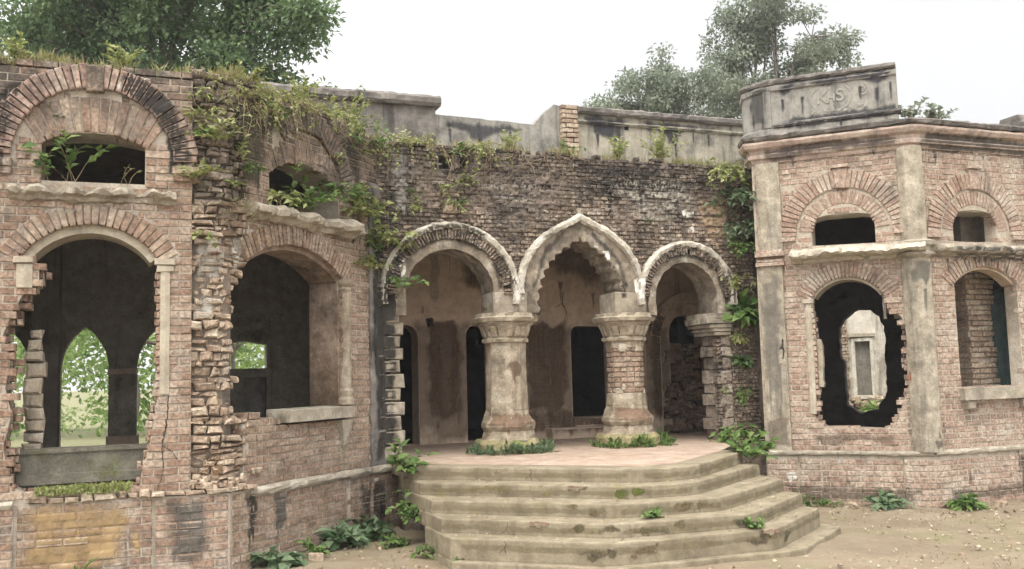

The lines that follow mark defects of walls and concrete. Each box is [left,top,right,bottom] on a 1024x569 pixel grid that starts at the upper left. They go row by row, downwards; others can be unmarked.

damp [447,122,518,143]
damp [352,191,485,461]
flaking render [190,230,249,487]
crack [157,396,179,490]
damp [168,502,205,562]
damp [246,495,258,547]
damp [274,494,287,537]